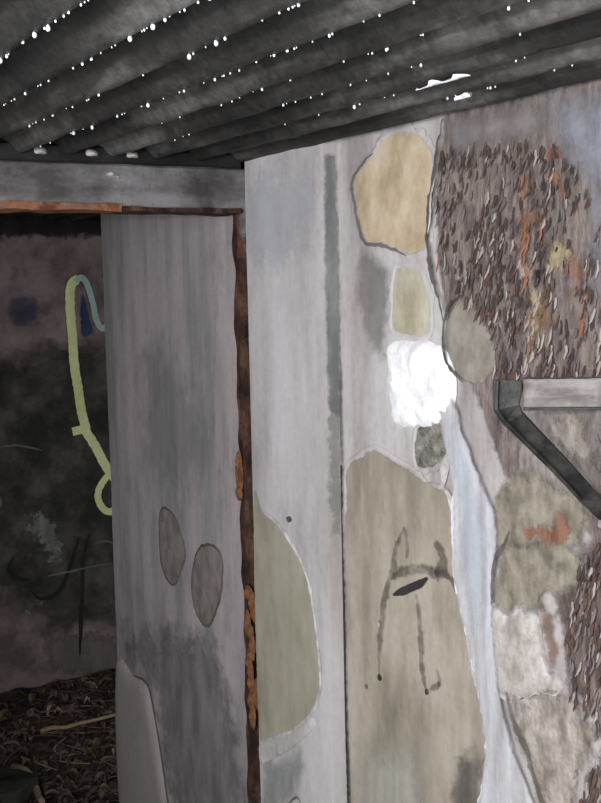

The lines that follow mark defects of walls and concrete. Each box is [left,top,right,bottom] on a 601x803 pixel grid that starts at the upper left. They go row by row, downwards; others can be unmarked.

rust [235,450,244,501]
peeling [343,79,601,803]
rust [524,513,570,547]
water stain [125,626,245,803]
rust [244,585,258,730]
spalling [253,491,322,765]